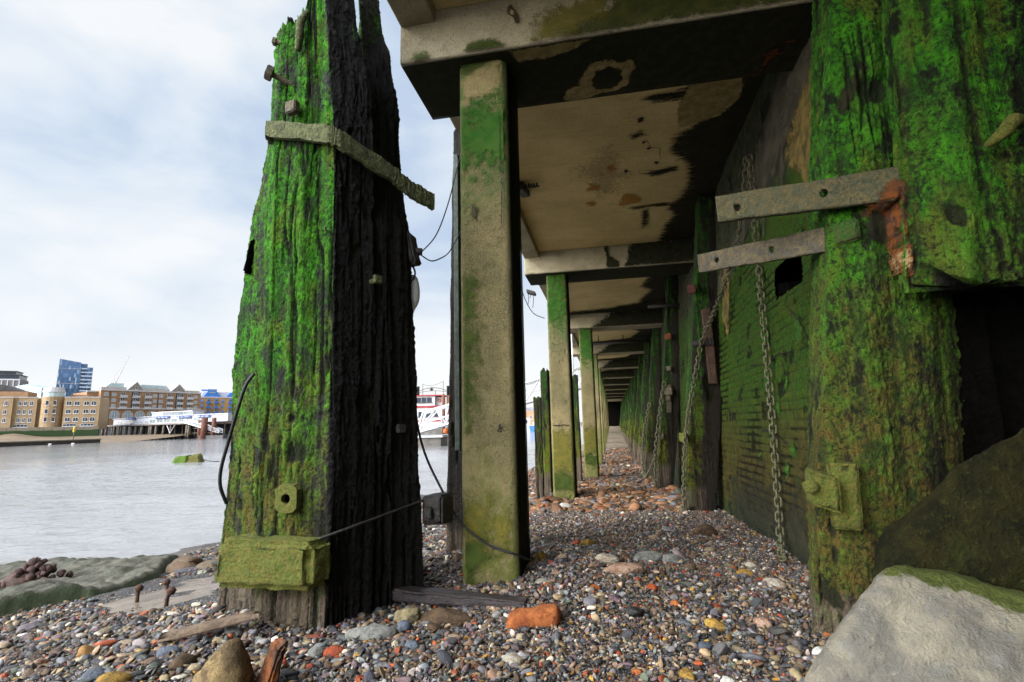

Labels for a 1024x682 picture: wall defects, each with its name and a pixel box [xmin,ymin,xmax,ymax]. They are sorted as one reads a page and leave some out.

peeling [563,59,636,101]
corrosion [859,177,915,279]
leakage [402,0,813,576]